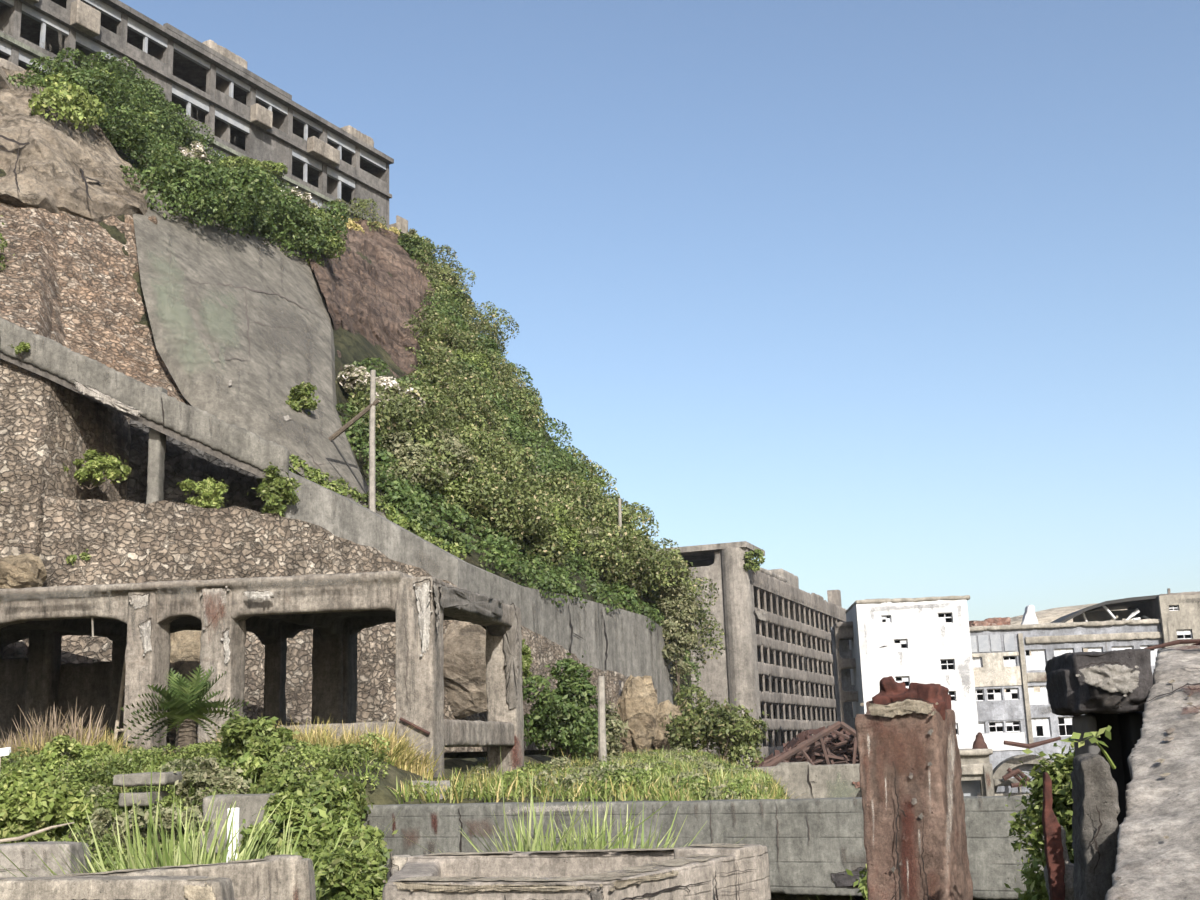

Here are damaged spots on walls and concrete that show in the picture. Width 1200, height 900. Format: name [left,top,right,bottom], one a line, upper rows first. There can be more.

spalling [413,578,520,709]
spalling [32,859,266,900]
spalling [387,853,399,882]